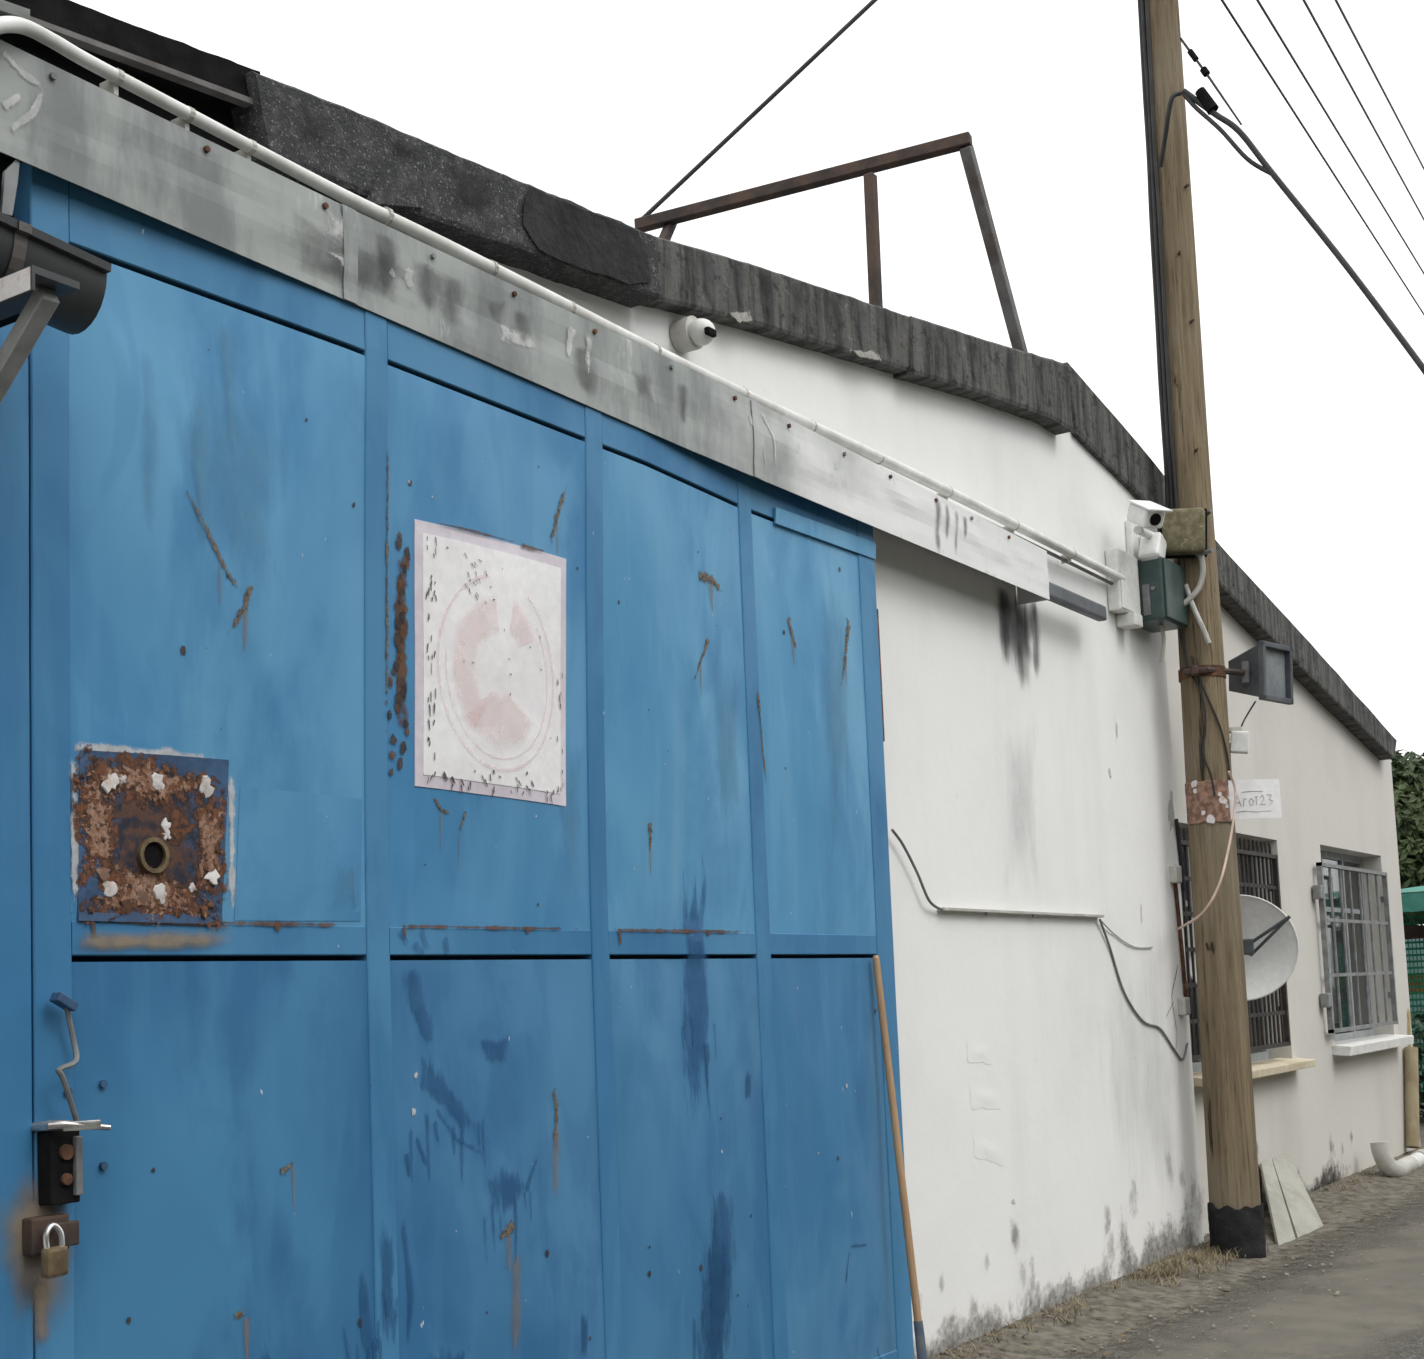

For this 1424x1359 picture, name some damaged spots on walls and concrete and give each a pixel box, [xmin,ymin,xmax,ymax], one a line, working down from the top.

rust [187,491,253,627]
rust [386,453,411,776]
rust [699,570,720,589]
rust [841,619,851,684]
water stain [1001,592,1038,676]
rust [69,743,335,947]
rust [403,925,561,937]
rust [618,928,738,944]
rust [11,1193,57,1339]
water stain [1024,1204,1194,1318]
water stain [914,1313,1005,1359]